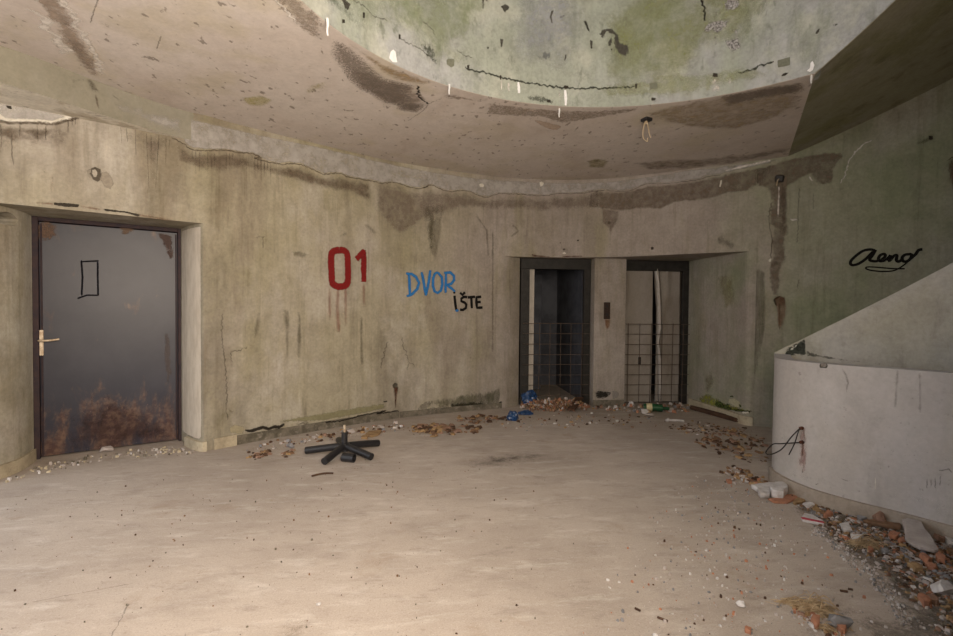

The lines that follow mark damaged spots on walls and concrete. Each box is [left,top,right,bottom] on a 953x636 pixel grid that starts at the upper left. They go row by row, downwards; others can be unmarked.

water stain [28,0,104,72]
flaking render [0,103,74,123]
water stain [333,41,423,112]
water stain [654,79,803,128]
water stain [175,139,503,231]
flaking render [185,120,774,196]
water stain [510,140,872,292]